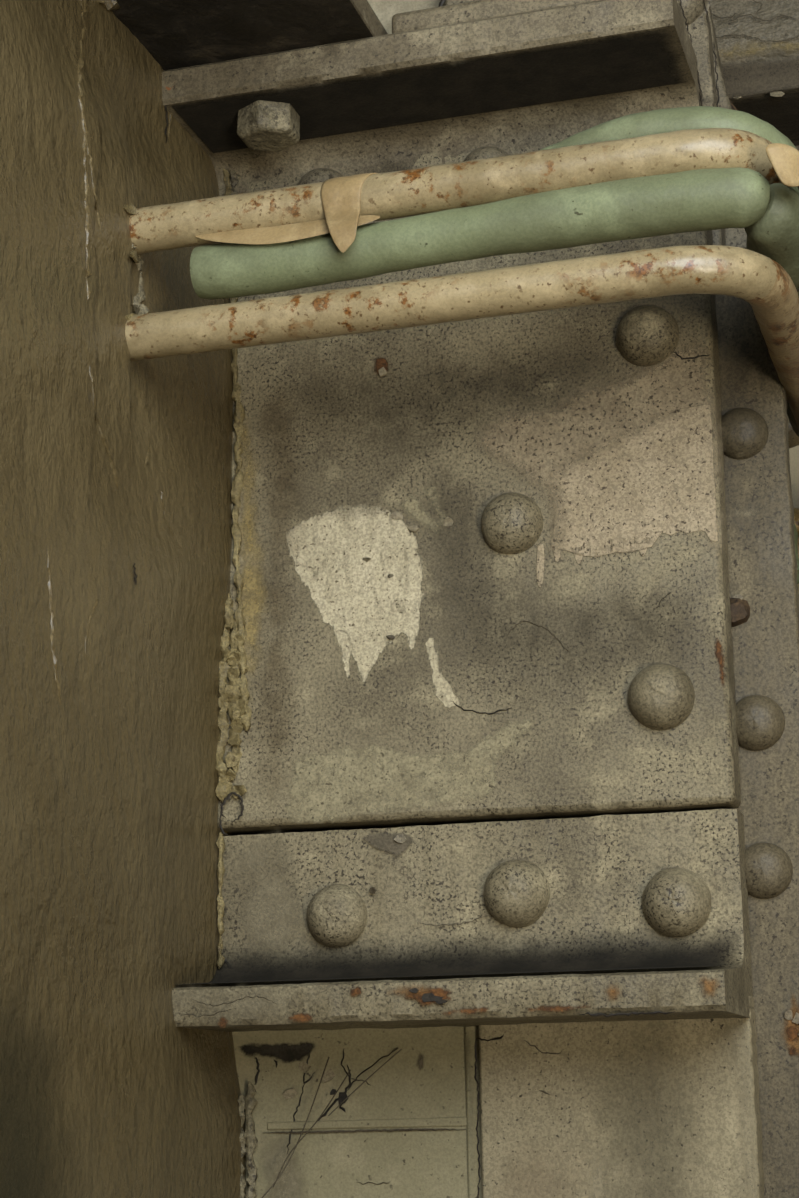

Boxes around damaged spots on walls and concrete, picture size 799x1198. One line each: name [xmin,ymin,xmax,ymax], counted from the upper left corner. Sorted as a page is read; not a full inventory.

flaking render [223,168,241,196]
flaking render [215,348,252,802]
peeling [286,487,460,708]
flaking render [216,832,225,969]
flaking render [237,1081,258,1198]
damp [240,1042,314,1084]
crack [265,1034,564,1198]
rust [402,988,489,1015]
rust [784,1008,799,1055]